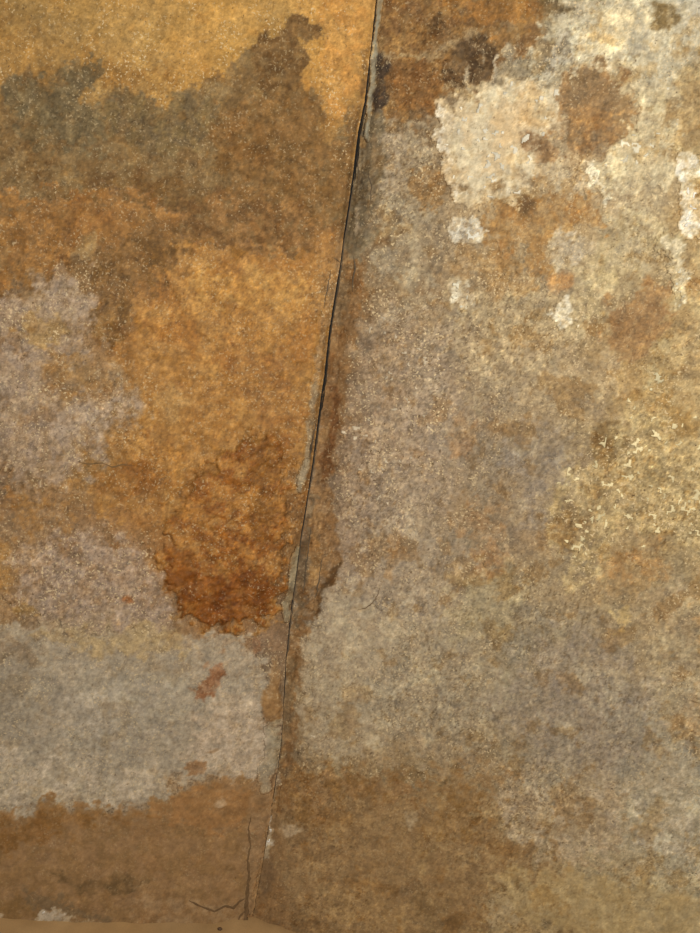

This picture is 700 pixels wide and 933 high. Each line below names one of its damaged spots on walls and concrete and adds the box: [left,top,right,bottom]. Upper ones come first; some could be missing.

corrosion [0,179,335,654]
water stain [0,0,564,769]
crack [287,15,376,654]
efflorescence [545,293,580,332]
water stain [545,224,597,273]
efflorescence [575,158,617,209]
water stain [654,41,700,312]
water stain [467,596,675,786]
crack [190,817,251,920]
water stain [0,747,700,933]